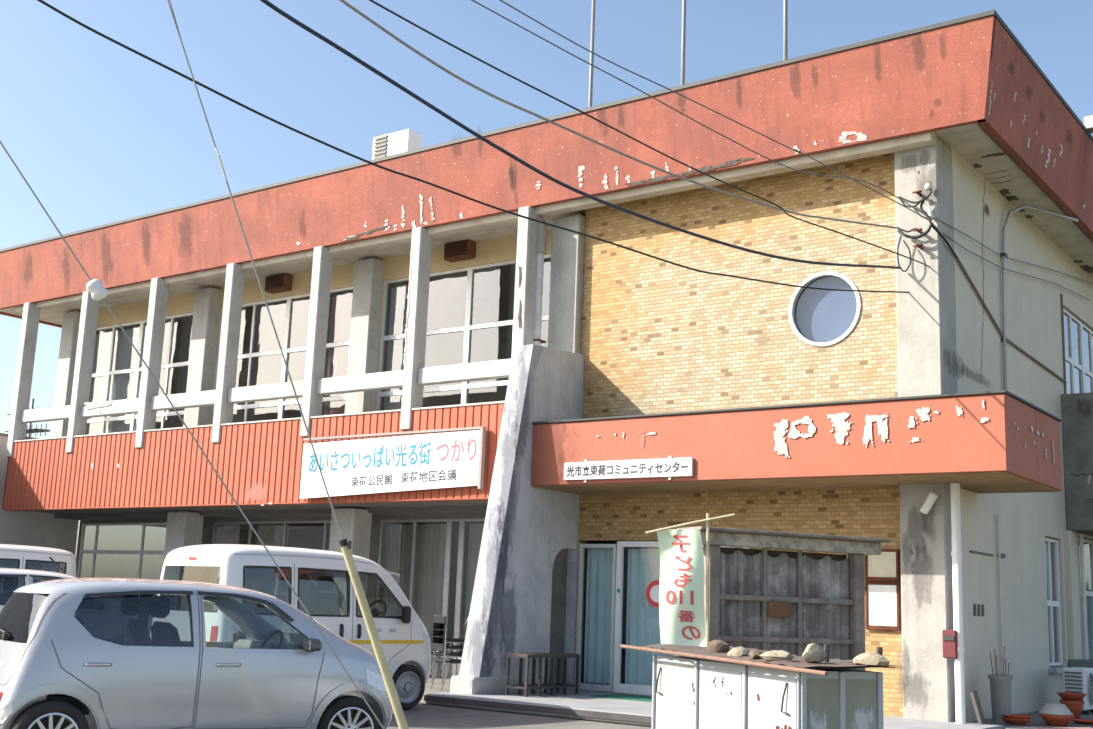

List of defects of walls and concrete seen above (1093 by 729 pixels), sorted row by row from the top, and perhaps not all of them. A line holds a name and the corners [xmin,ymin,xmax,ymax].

peeling [839,131,867,144]
peeling [1027,130,1063,169]
peeling [342,194,435,242]
peeling [772,416,816,458]
peeling [825,412,889,448]
peeling [906,407,940,443]